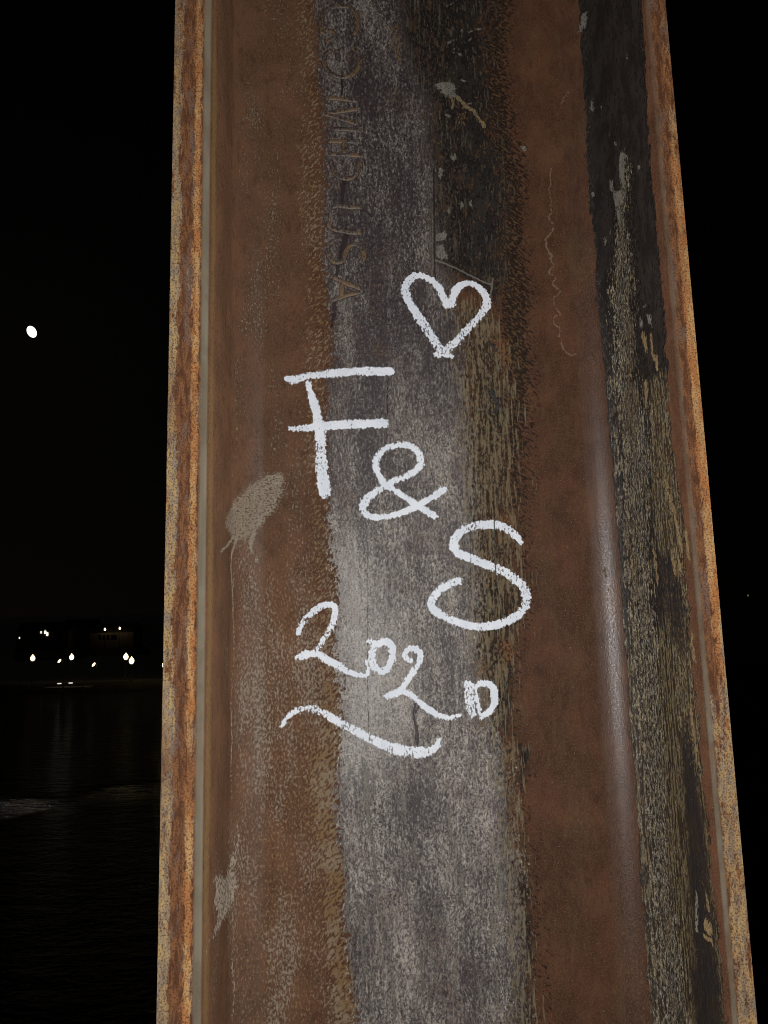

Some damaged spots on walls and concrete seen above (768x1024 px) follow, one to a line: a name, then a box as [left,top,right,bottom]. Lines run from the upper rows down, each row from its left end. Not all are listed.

peeling [577,0,666,380]
rust [641,331,658,408]
rust [663,470,691,576]
rust [687,703,699,766]
peeling [695,890,710,933]